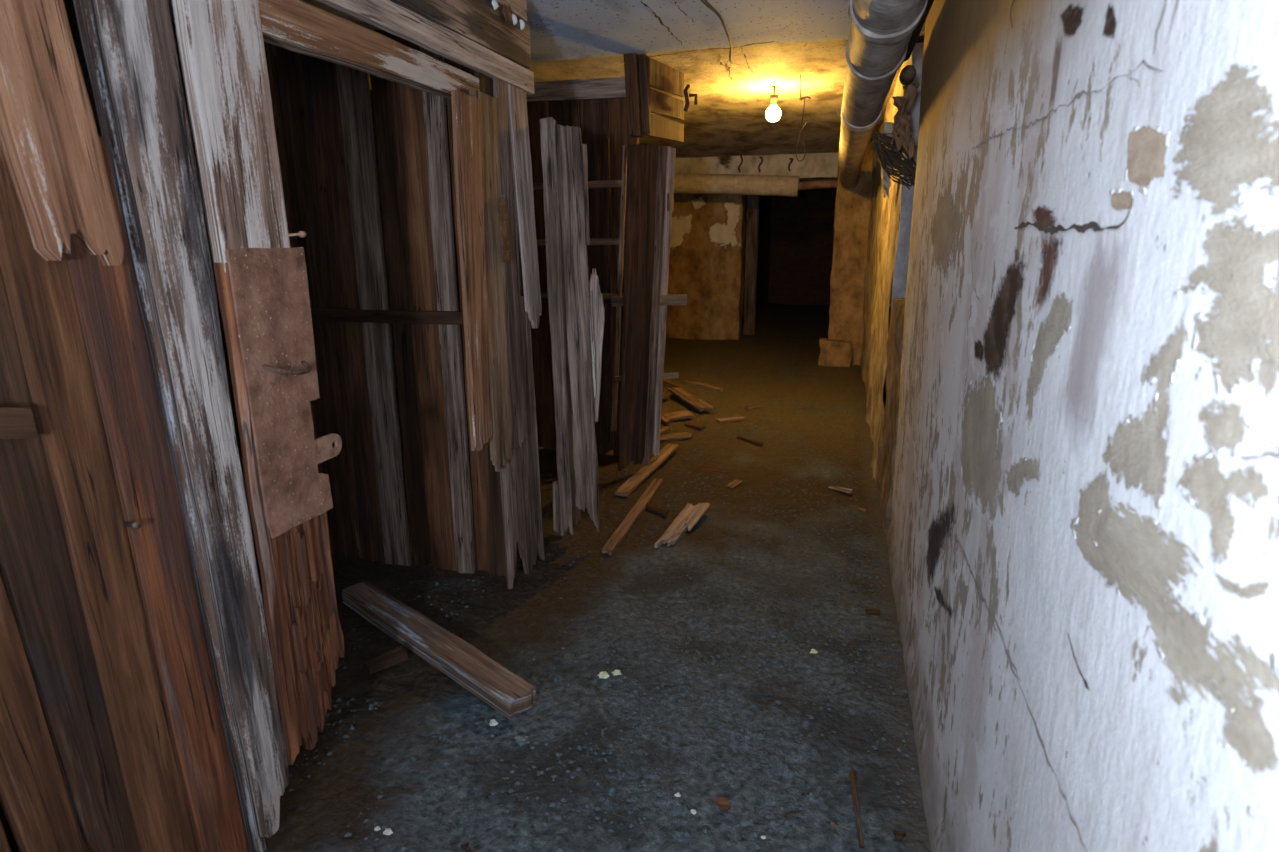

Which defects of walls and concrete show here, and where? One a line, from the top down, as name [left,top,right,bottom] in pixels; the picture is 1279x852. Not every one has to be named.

crack [641,0,808,79]
crack [972,0,1179,149]
peeling [1070,62,1279,775]
crack [1239,440,1279,460]
crack [947,528,1090,852]